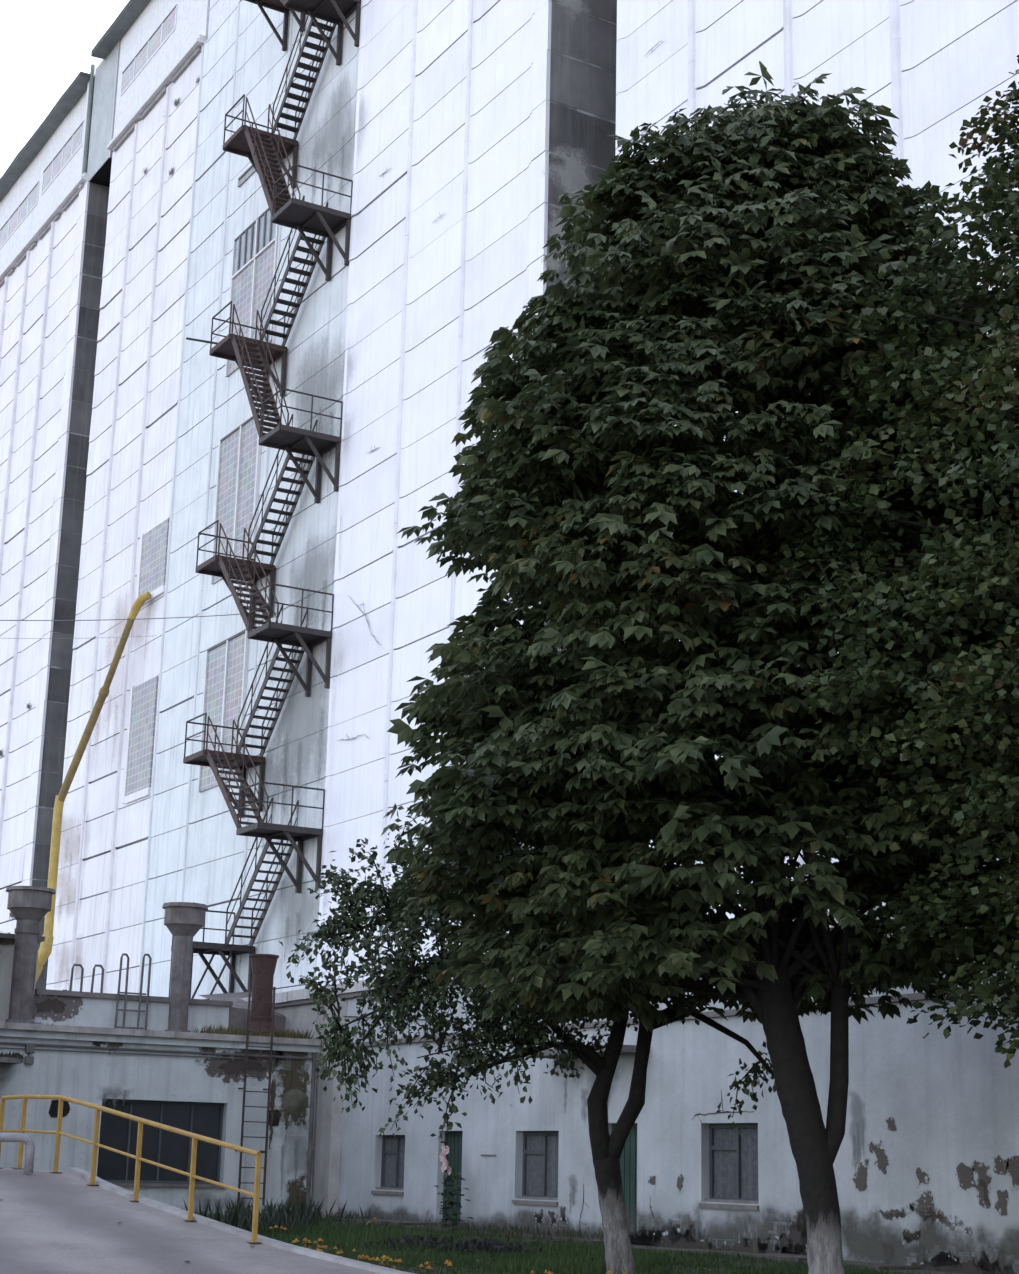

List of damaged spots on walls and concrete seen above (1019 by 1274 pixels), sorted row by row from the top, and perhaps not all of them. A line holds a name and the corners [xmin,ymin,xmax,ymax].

peeling [195,1047,284,1084]
spalling [269,1109,281,1126]
peeling [853,1117,896,1192]
peeling [956,1155,1019,1216]